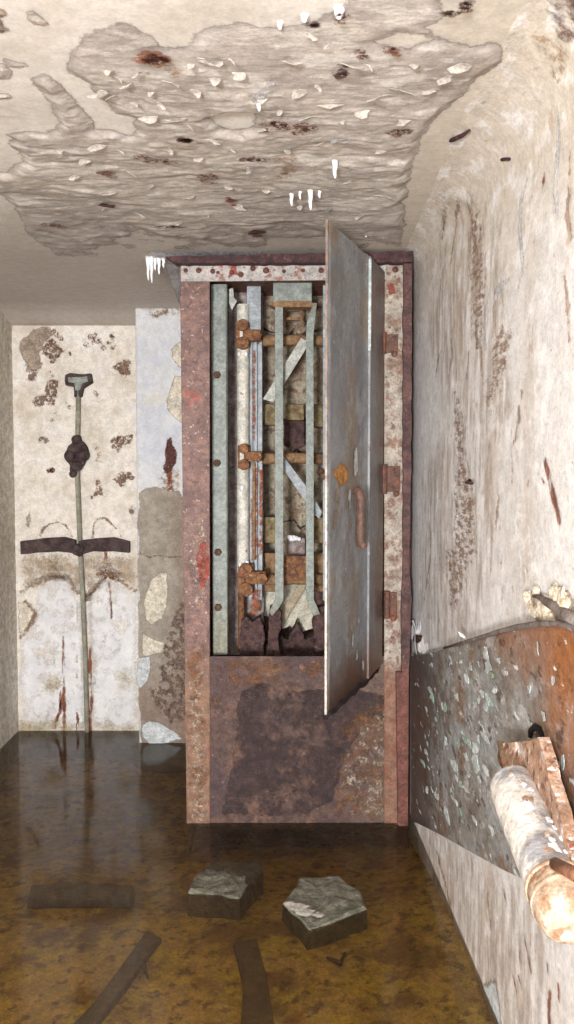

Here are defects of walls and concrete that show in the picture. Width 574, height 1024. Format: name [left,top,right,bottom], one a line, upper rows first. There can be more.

rust [134,50,176,75]
flaking render [0,0,502,257]
flaking render [19,326,63,406]
flaking render [113,360,131,376]
flaking render [91,471,135,499]
flaking render [111,434,133,452]
rust [161,438,179,491]
rust [543,458,561,525]
flaking render [129,487,186,745]
rust [54,640,93,733]